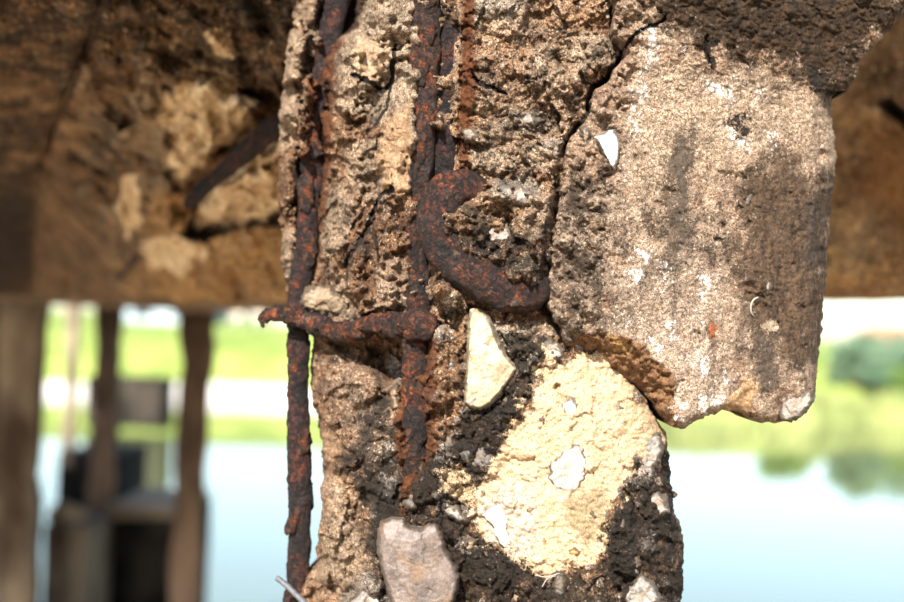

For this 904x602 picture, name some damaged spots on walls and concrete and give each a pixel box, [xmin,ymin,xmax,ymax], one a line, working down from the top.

spalling [152,75,258,179]
crack [172,214,281,242]
spalling [193,140,281,230]
corrosion [296,39,345,256]
crack [343,185,395,268]
crack [351,43,397,126]
spalling [374,98,419,202]
corrosion [458,0,478,170]
crack [563,6,667,149]
corrosion [394,338,442,517]
leakage [339,332,682,602]
spalling [571,332,678,427]